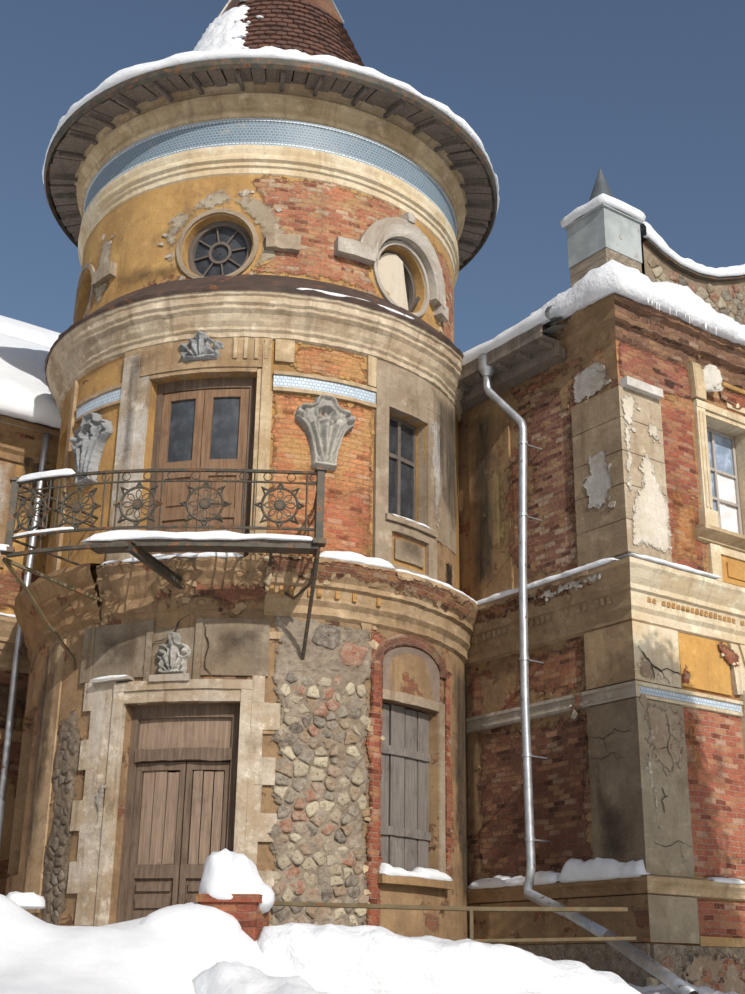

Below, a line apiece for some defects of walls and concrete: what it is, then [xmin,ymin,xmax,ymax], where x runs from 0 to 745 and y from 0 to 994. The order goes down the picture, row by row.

spalling [143,174,402,300]
spalling [482,341,699,602]
crack [638,646,682,684]
spalling [719,642,741,667]